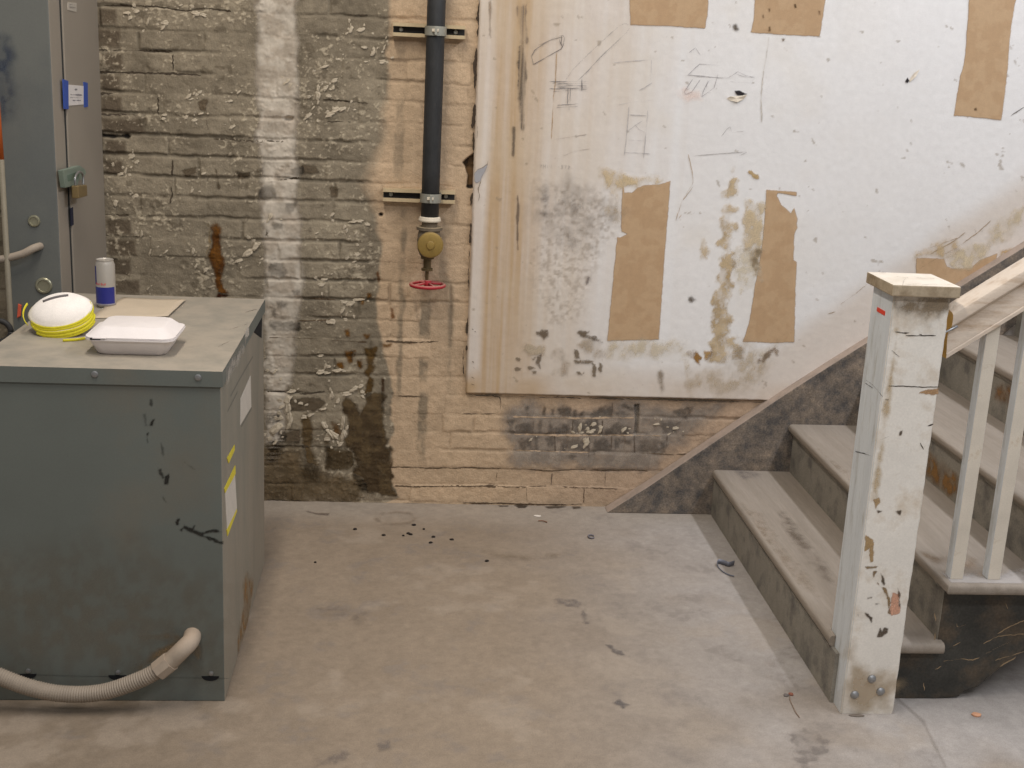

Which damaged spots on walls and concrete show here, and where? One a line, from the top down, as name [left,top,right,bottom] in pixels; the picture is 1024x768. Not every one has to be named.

peeling [630,0,708,29]
peeling [751,0,825,36]
peeling [954,0,1016,120]
water stain [603,171,637,187]
rust [208,224,227,297]
peeling [607,181,670,341]
water stain [737,200,766,281]
peeling [743,190,797,343]
peeling [916,254,997,284]
peeling [264,350,366,452]
water stain [264,346,397,502]
peeling [865,536,901,615]